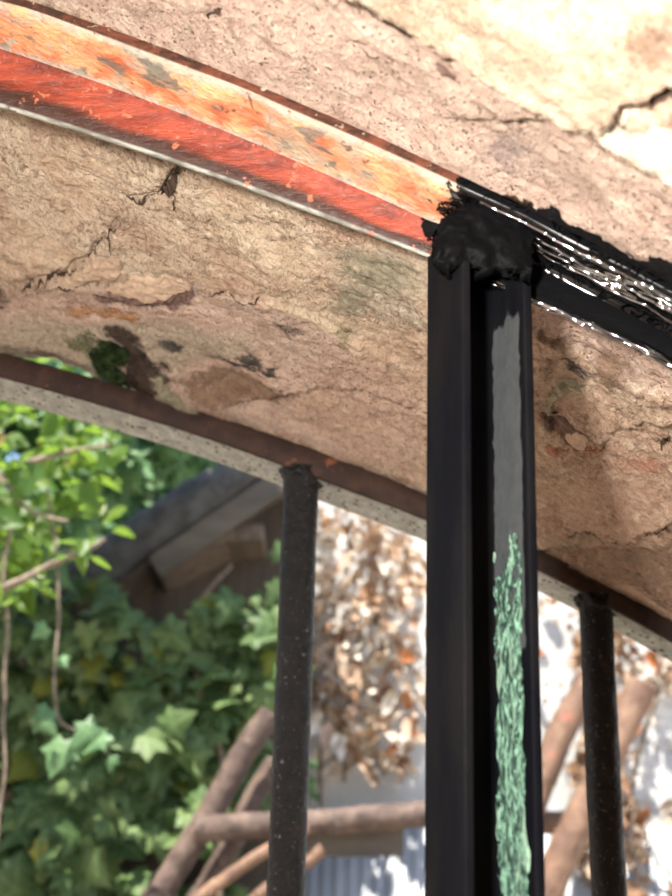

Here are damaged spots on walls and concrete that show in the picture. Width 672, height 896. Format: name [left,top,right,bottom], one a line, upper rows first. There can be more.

crack [578,87,672,183]
peeling [583,102,672,188]
crack [118,166,180,211]
crack [15,221,117,292]
crack [197,290,260,306]